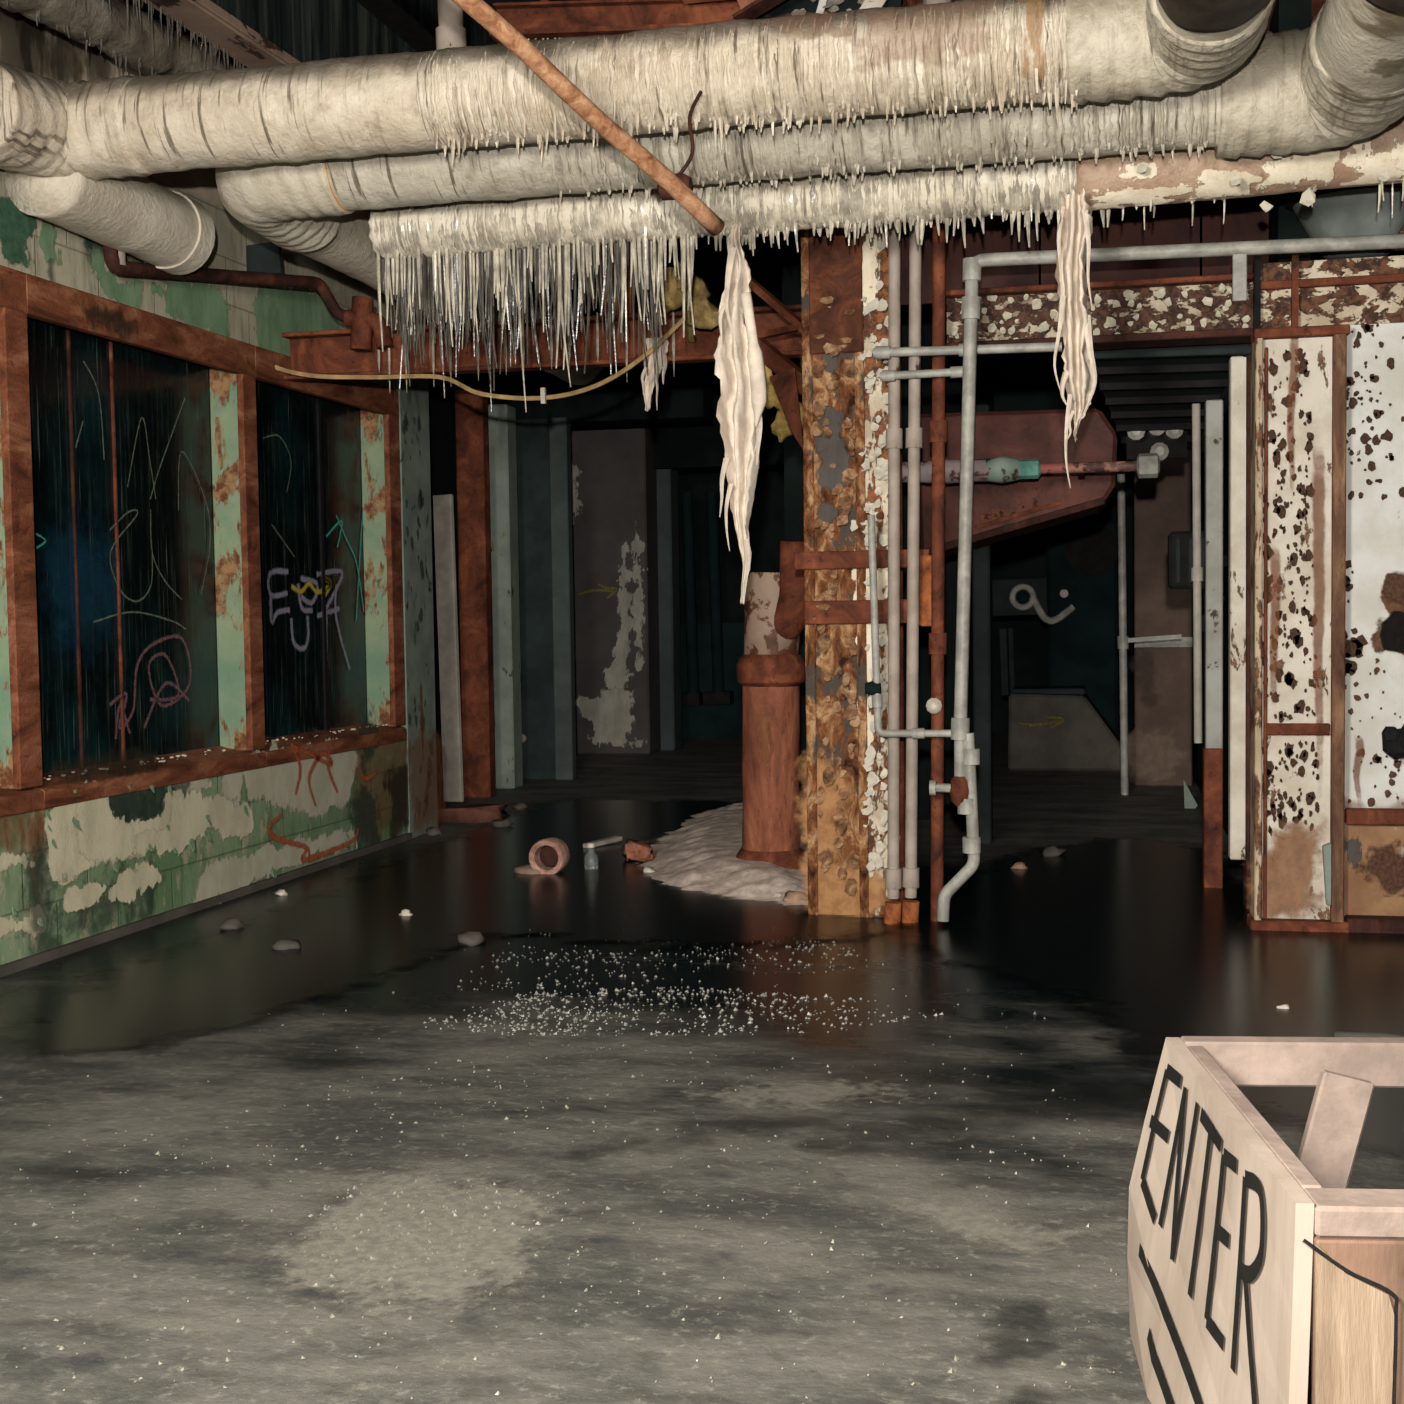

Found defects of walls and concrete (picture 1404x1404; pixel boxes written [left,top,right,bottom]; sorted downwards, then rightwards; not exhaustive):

peeling [39,219,62,266]
peeling [83,241,231,337]
peeling [253,285,340,357]
peeling [571,462,583,534]
rust [1262,342,1324,723]
peeling [575,521,648,751]
peeling [0,737,361,913]
rust [796,761,885,917]
rust [1250,740,1320,918]
peeling [1344,836,1404,896]
peeling [0,907,46,939]